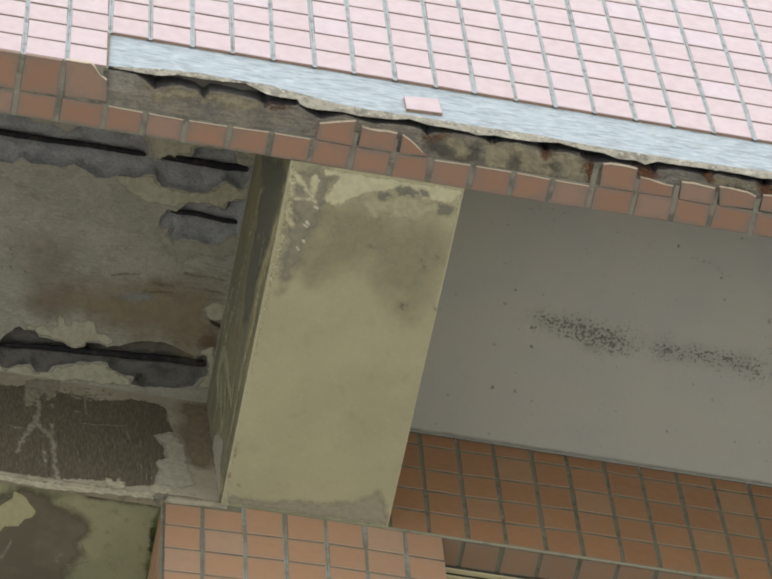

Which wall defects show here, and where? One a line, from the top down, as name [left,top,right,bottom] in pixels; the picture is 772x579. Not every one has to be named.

peeling [98,34,772,213]
spalling [0,113,255,246]
water stain [281,169,336,281]
water stain [378,186,429,200]
spalling [0,314,214,388]
water stain [540,316,630,352]
peeling [0,434,195,531]
water stain [0,487,90,579]